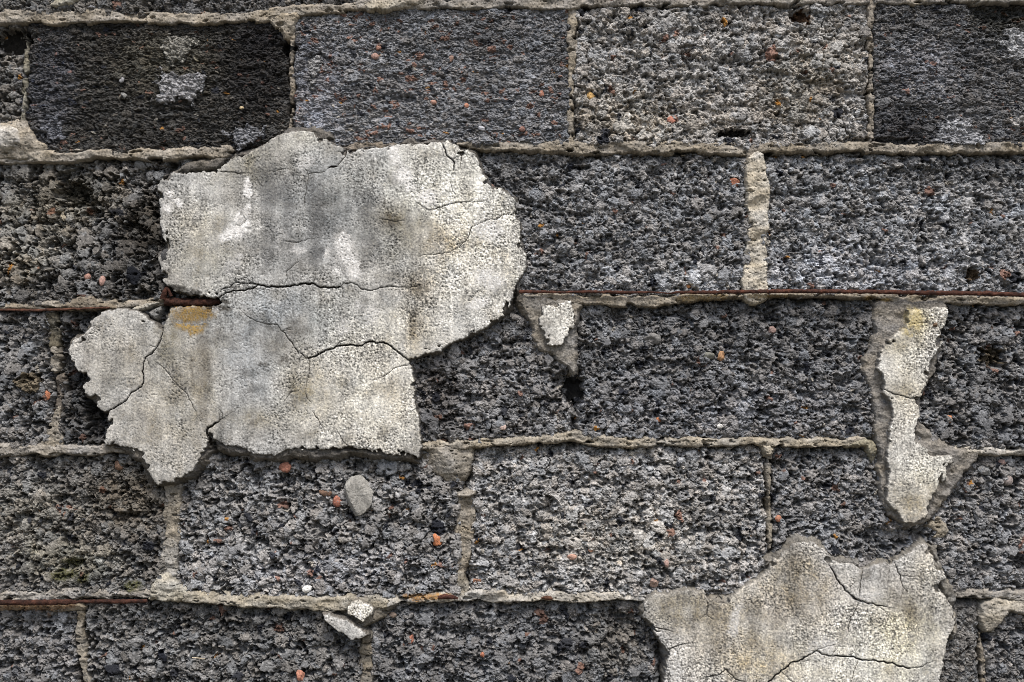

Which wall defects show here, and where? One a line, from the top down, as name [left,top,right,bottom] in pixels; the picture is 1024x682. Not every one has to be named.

spalling [789,6,810,25]
spalling [0,30,38,56]
spalling [718,128,756,138]
crack [418,143,516,257]
corrosion [160,287,221,335]
corrosion [519,289,1024,301]
crack [219,238,414,446]
crack [109,332,223,445]
spalling [560,374,585,405]
corrosion [0,599,148,613]
flaking render [322,597,375,640]
crack [709,560,923,682]